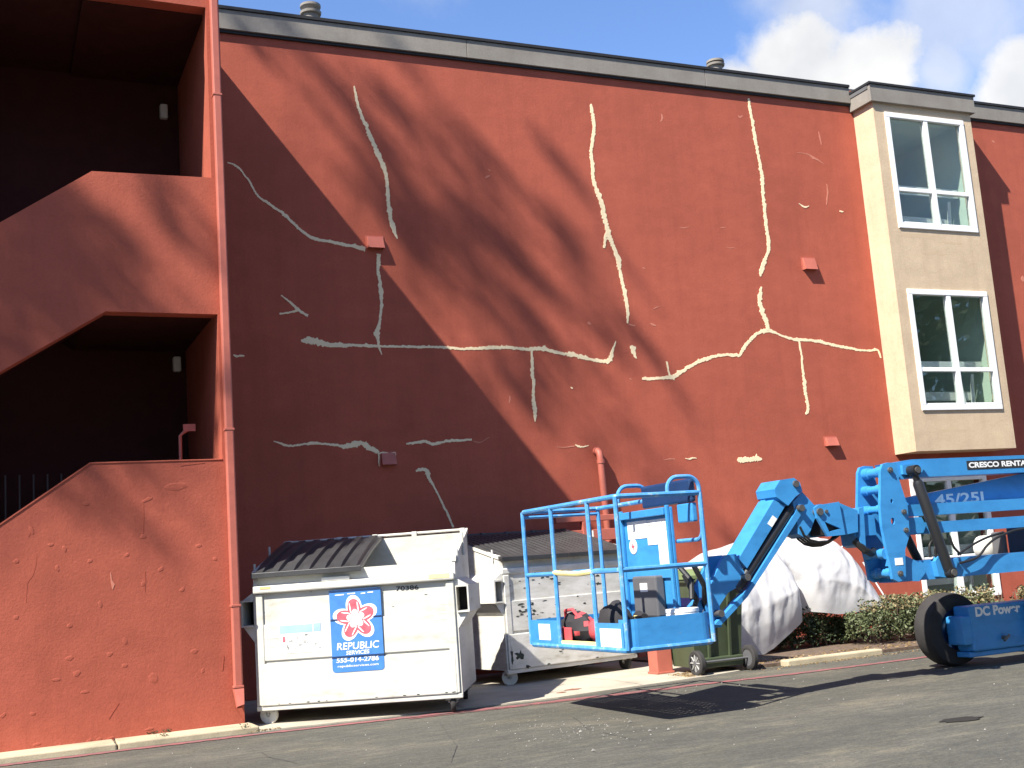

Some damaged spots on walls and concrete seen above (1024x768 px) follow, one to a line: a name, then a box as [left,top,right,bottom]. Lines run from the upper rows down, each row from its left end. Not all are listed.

crack [227,86,630,422]
crack [642,98,881,415]
crack [274,437,490,528]